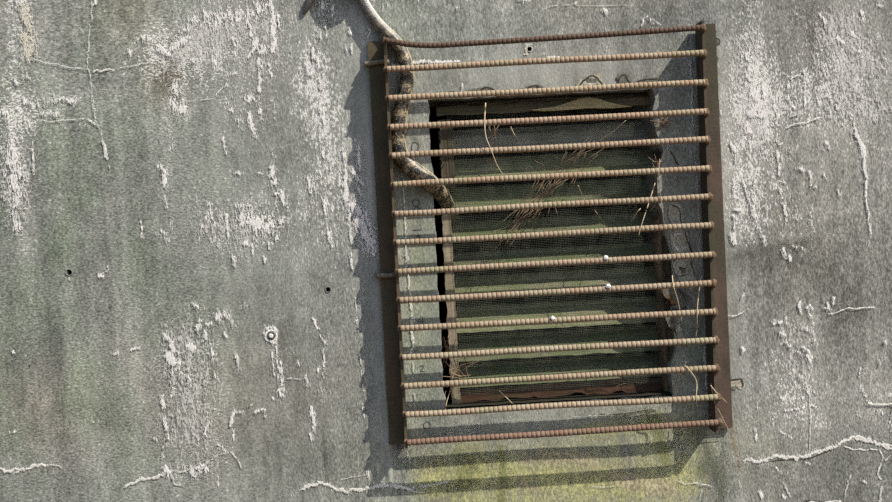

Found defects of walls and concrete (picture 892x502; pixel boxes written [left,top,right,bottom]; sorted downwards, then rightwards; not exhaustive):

crack [33,0,155,169]
crack [0,461,62,473]
crack [124,452,242,488]
crack [291,475,448,497]
crack [732,399,892,502]